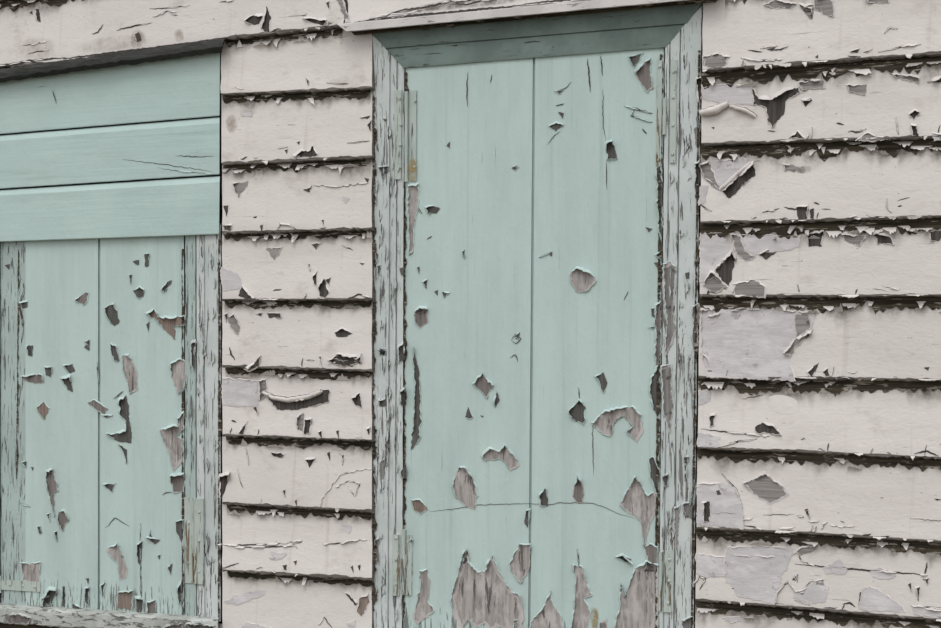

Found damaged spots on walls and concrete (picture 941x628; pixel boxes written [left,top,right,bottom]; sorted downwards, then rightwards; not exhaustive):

peeling [0,0,83,22]
peeling [225,0,351,48]
peeling [674,48,941,199]
peeling [202,249,372,335]
peeling [222,205,383,275]
peeling [222,141,440,255]
peeling [88,343,138,465]
peeling [216,341,422,468]
crack [321,359,390,499]
peeling [449,197,941,628]
peeling [213,472,372,520]
crack [668,429,790,565]